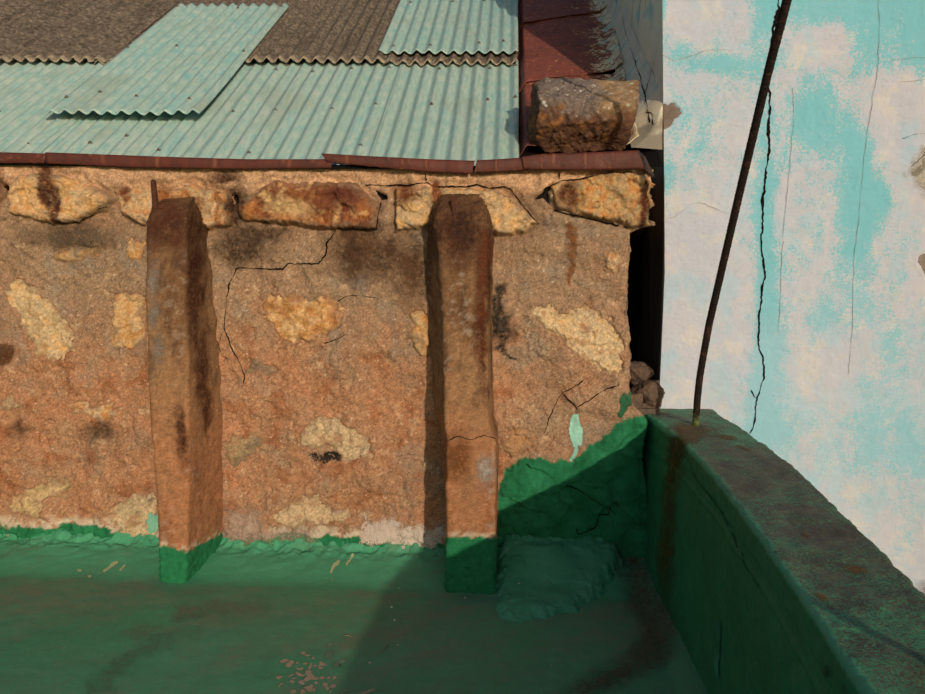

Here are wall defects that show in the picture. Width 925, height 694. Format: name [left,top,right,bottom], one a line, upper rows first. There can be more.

crack [771,0,780,41]
peeling [663,103,681,134]
crack [218,172,627,384]
crack [750,88,795,433]
crack [544,380,620,433]